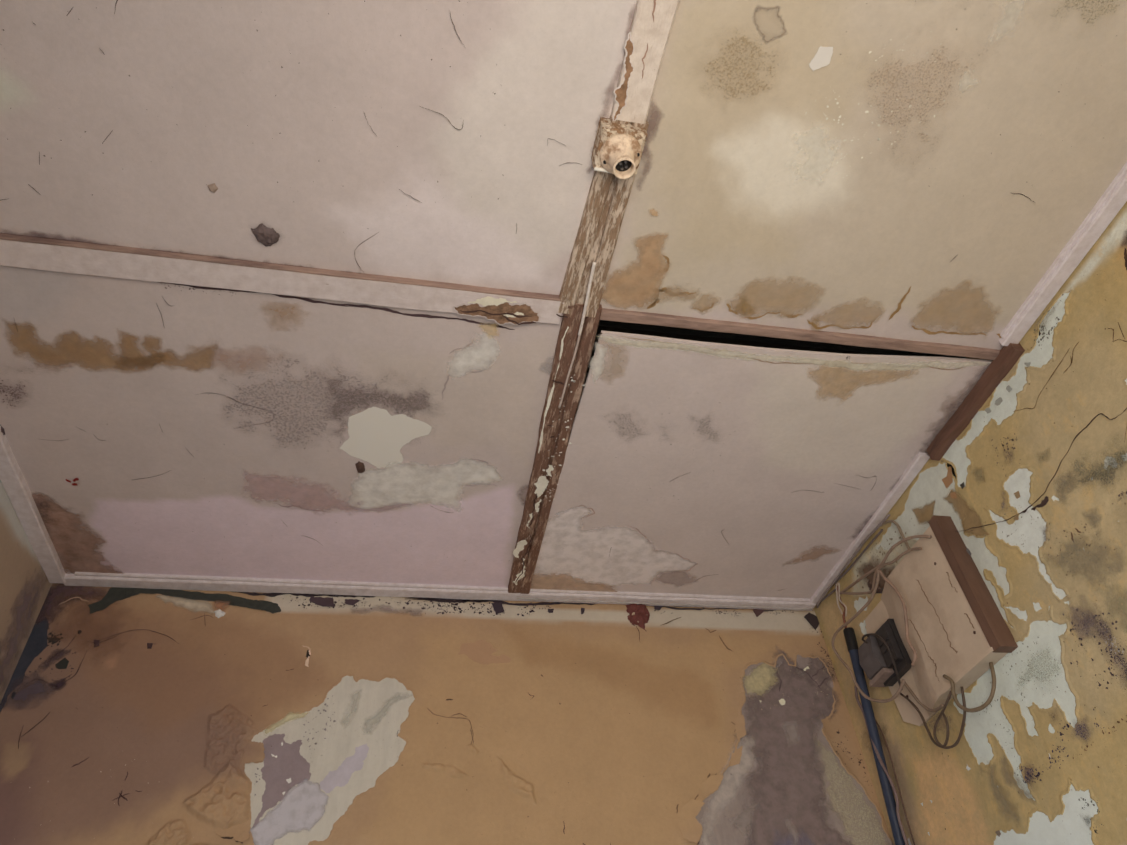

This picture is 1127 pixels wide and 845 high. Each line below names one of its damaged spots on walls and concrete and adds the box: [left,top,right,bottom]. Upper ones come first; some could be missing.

crack [159,282,515,330]
peeling [453,296,541,326]
leakage [226,327,500,449]
leakage [247,459,501,512]
peeling [339,406,432,469]
peeling [513,314,989,585]
leakage [0,494,697,712]
leakage [645,605,739,616]
peeling [874,287,1103,845]
leakage [1063,597,1127,690]
peeling [243,673,418,845]
leakage [990,705,1127,818]